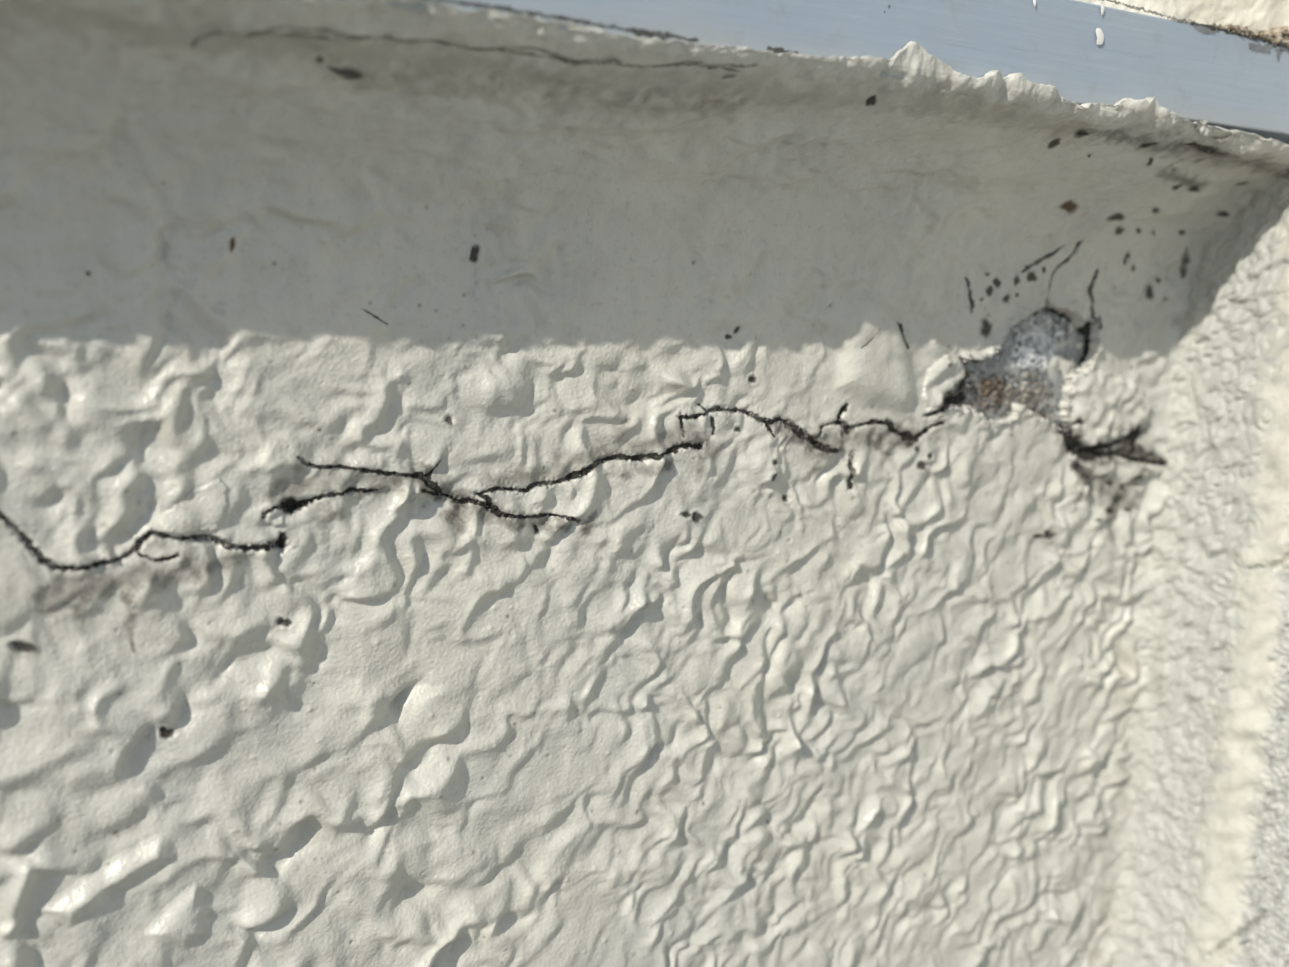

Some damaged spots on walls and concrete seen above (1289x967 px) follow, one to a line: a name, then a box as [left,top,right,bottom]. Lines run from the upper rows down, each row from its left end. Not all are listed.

crack [0,392,960,571]
spalling [922,306,1152,446]
crack [1051,418,1167,466]